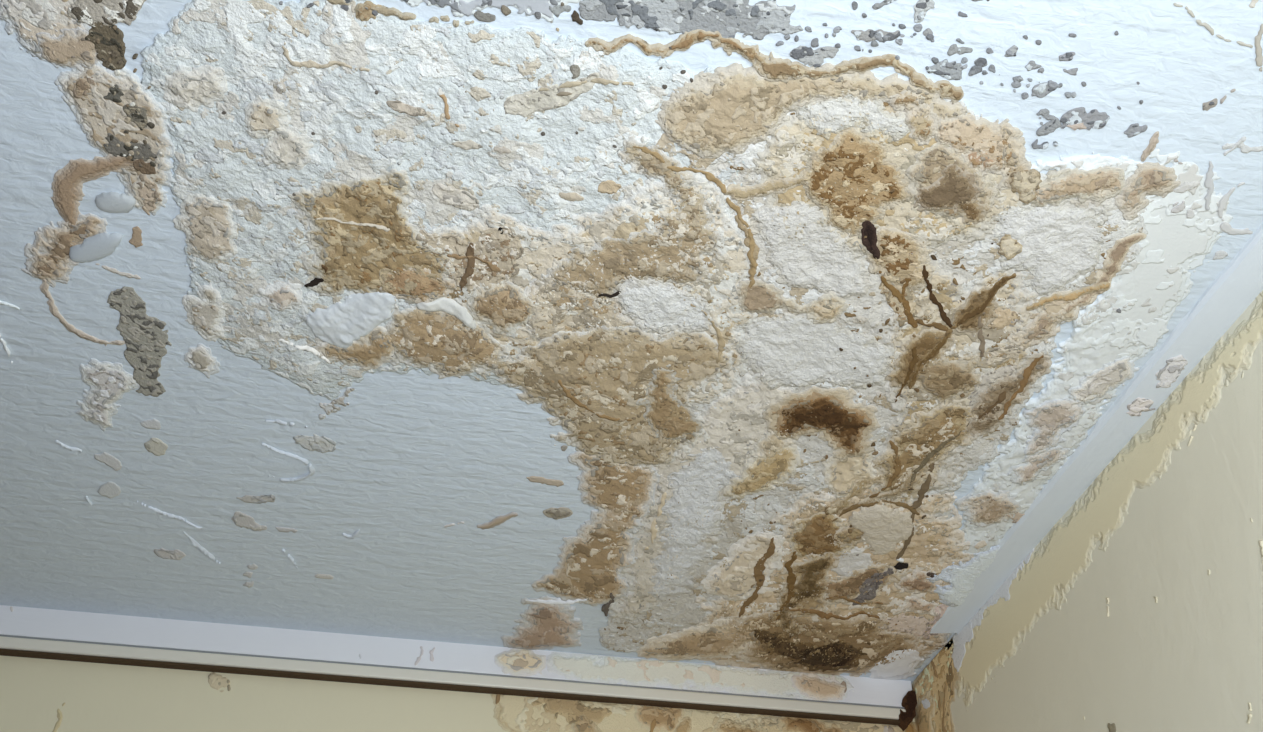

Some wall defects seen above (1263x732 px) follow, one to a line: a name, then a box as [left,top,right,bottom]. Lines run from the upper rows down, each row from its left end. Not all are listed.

leakage [327,0,474,27]
leakage [0,0,238,346]
leakage [182,283,229,378]
peeling [67,0,1233,613]
leakage [76,358,140,431]
leakage [141,419,168,456]
leakage [243,41,1263,732]
leakage [232,494,298,533]
peeling [945,548,1034,672]
leakage [208,672,231,692]